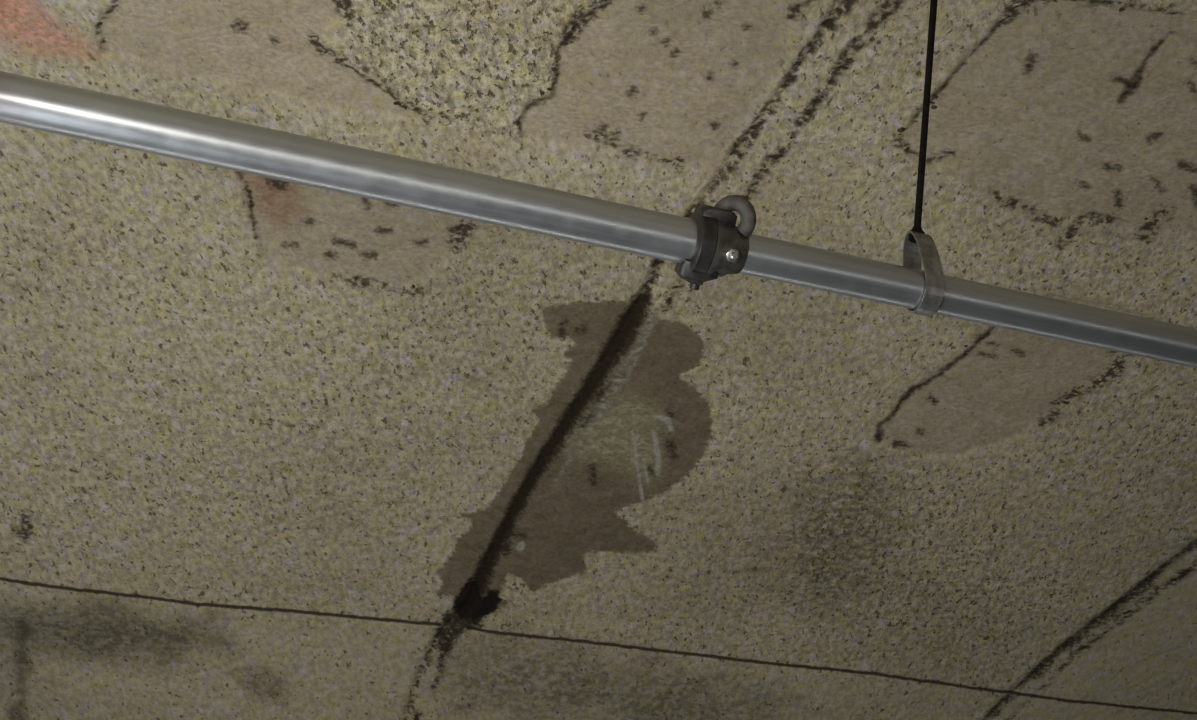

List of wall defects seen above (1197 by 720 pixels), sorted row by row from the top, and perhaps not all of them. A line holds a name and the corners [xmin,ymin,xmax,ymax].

crack [685,0,902,218]
crack [1114,40,1164,103]
damp [437,301,713,609]
crack [0,258,1197,720]